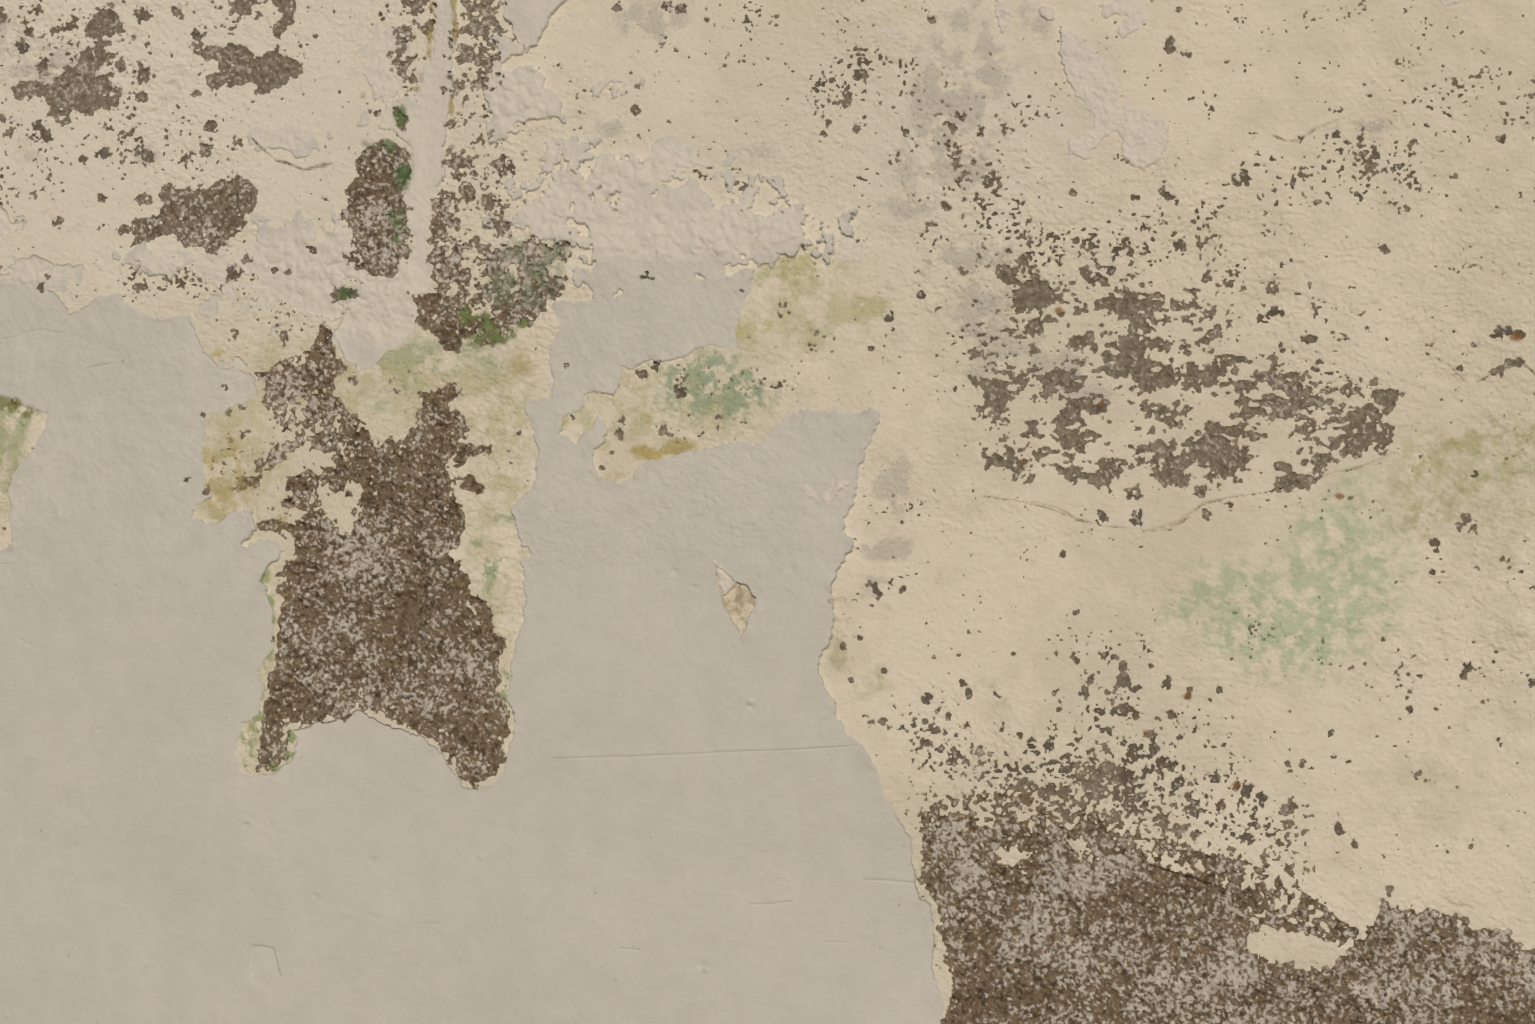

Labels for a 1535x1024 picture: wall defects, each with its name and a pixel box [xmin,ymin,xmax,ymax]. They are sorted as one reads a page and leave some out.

peeling [0,0,515,789]
peeling [331,0,1535,1024]